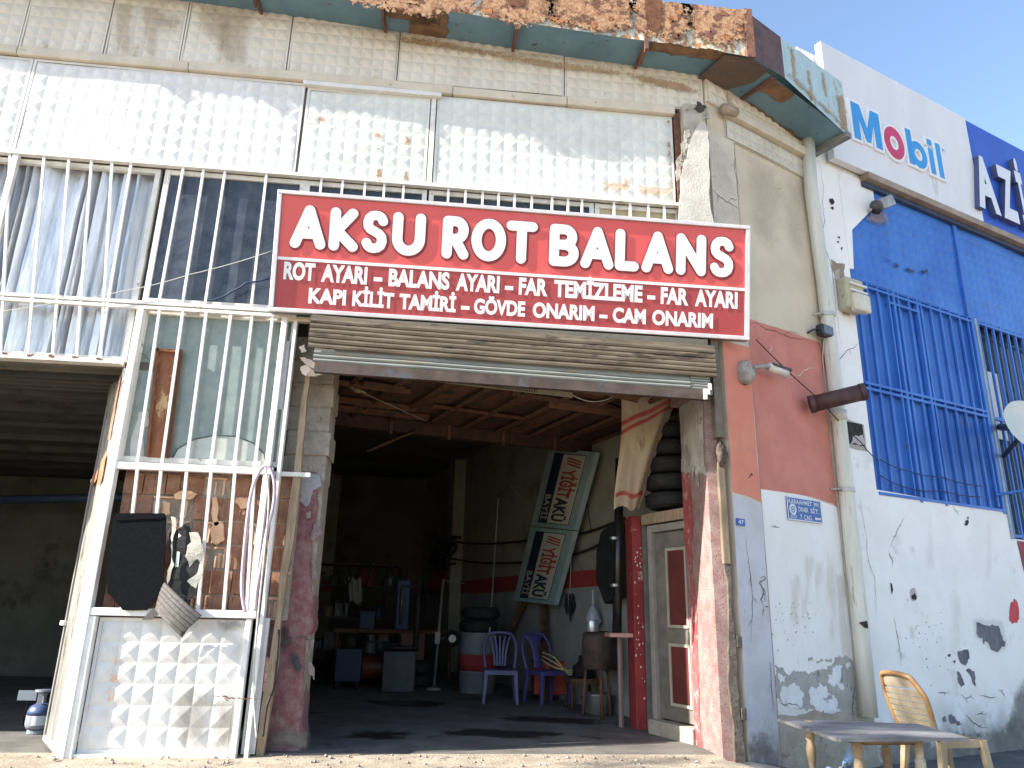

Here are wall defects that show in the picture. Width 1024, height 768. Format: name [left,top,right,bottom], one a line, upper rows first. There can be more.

corrosion [348,0,748,92]
spalling [675,101,709,181]
peeling [300,474,322,581]
spalling [307,639,315,680]
peeling [775,655,859,715]
peeling [945,649,976,687]
peeling [976,622,1006,652]